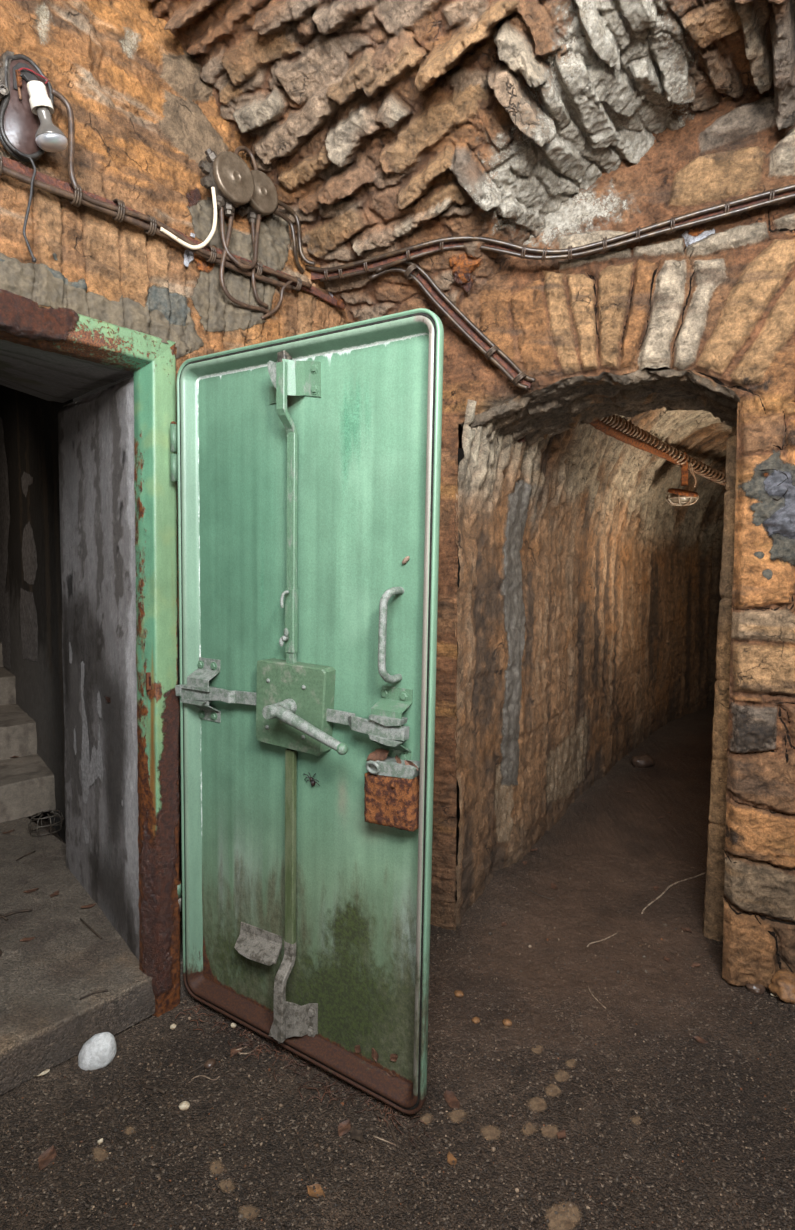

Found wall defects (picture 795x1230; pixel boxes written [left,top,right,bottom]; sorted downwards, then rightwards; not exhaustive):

corrosion [0,289,79,342]
peeling [0,416,38,670]
water stain [63,573,123,841]
corrosion [139,688,180,997]